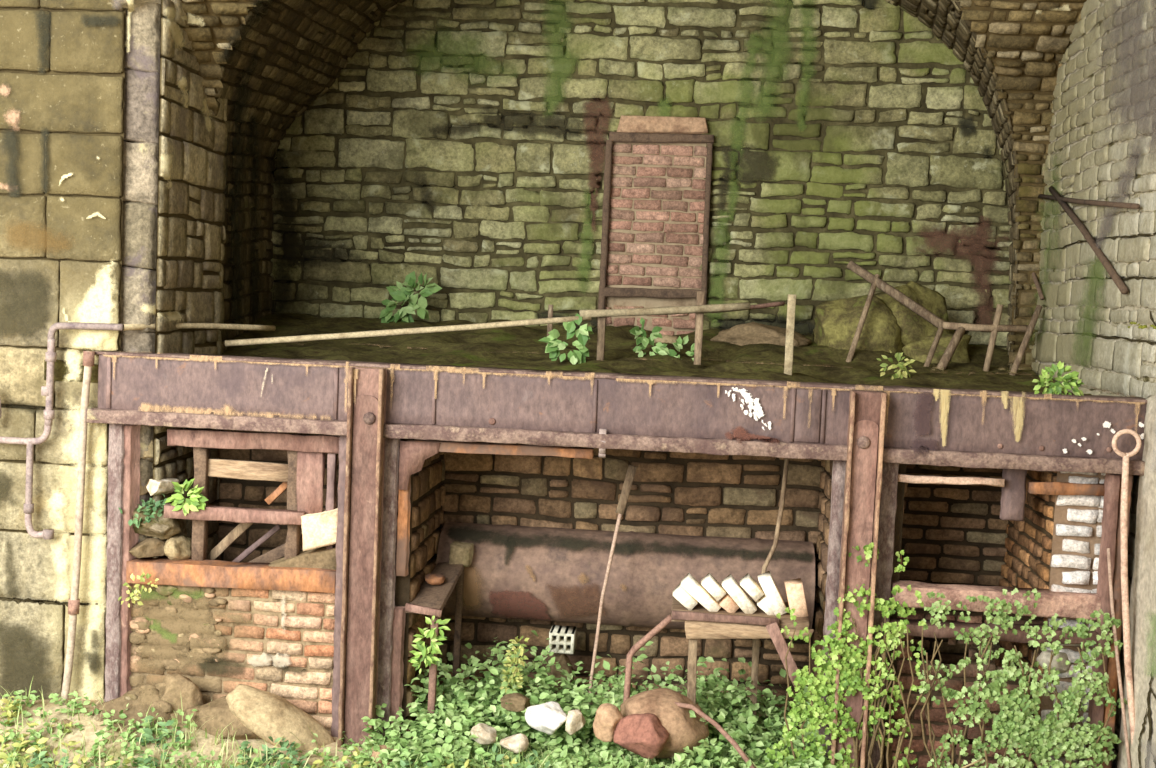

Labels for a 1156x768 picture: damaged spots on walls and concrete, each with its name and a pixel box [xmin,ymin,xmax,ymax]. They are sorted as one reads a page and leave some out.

crack [1041,232,1156,250]
crack [1069,274,1156,282]
crack [1063,312,1156,345]
rust [140,404,329,420]
rust [104,352,594,410]
peeling [725,387,771,430]
rust [616,378,1014,423]
rust [1028,386,1145,432]
rust [725,426,779,443]
crack [1138,671,1156,768]